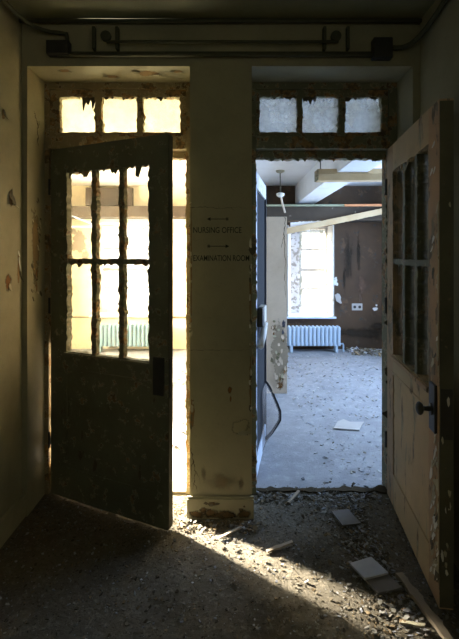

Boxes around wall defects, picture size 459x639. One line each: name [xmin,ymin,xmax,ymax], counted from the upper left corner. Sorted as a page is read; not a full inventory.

peeling [82,97,95,111]
peeling [31,198,42,301]
water stain [343,243,360,287]
peeling [270,320,289,388]